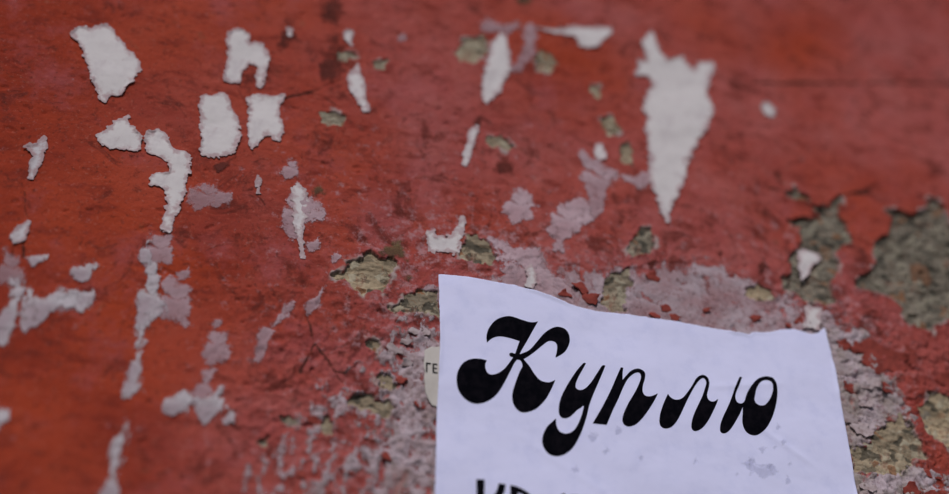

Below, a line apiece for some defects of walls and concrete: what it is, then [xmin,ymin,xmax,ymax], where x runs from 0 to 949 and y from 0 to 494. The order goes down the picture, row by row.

spalling [454,35,489,63]
spalling [535,50,558,74]
spalling [600,116,633,167]
spalling [331,252,397,296]
peeling [536,190,949,494]
peeling [243,285,440,494]